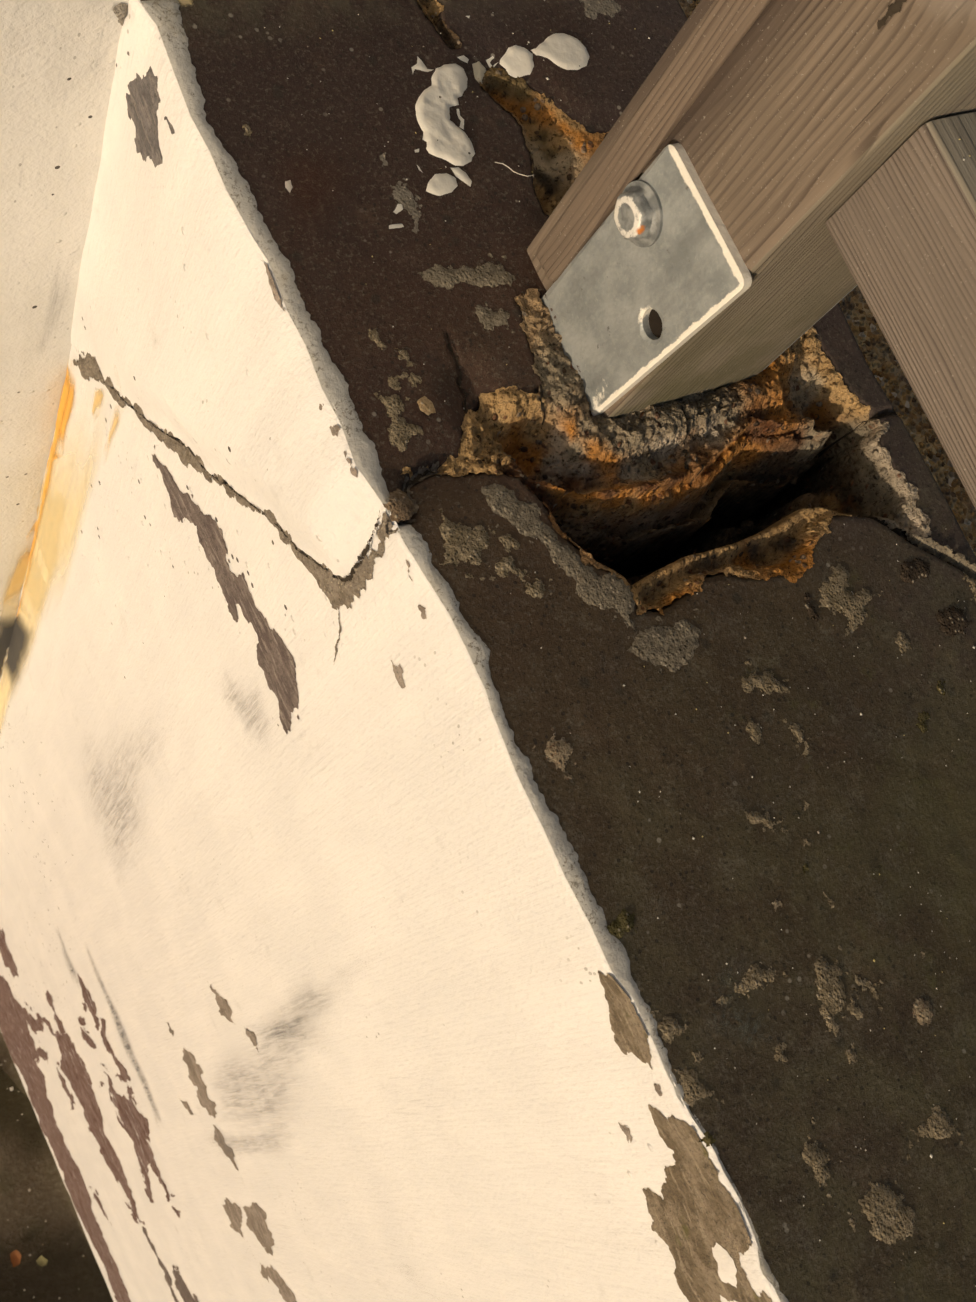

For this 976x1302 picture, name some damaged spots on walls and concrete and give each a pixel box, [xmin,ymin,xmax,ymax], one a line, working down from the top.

peeling [126,66,175,168]
spalling [367,253,976,673]
peeling [152,445,299,734]
peeling [209,984,259,1053]
peeling [716,962,788,1005]
peeling [814,945,884,1064]
peeling [0,928,199,1302]
peeling [181,1049,238,1170]
peeling [598,971,772,1302]
peeling [800,1117,843,1198]
peeling [222,1198,297,1302]
peeling [847,1180,915,1255]